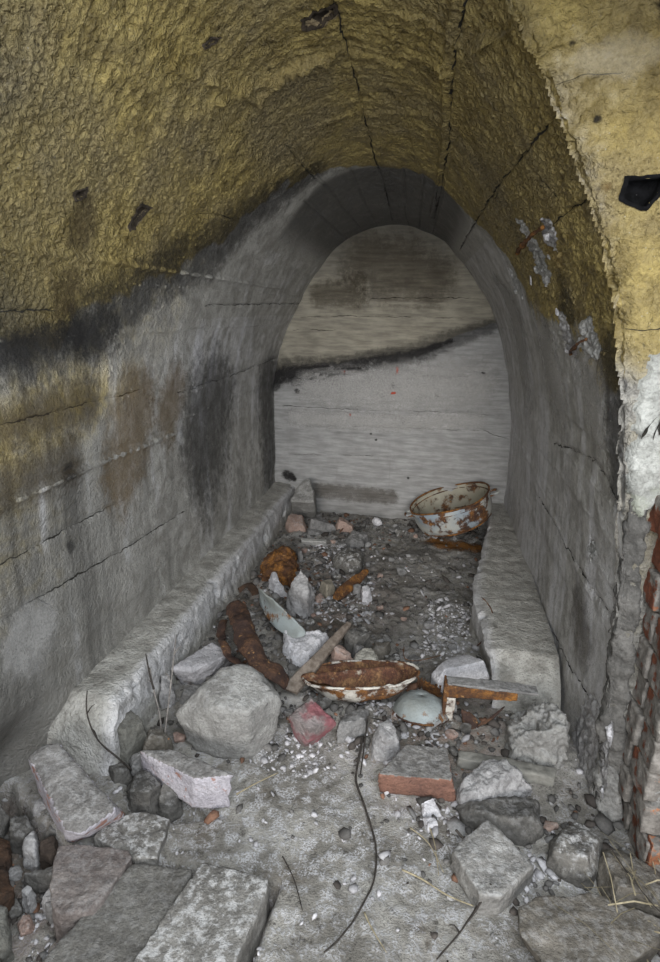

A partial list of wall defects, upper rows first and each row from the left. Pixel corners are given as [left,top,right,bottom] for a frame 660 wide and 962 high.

crack [333,0,393,219]
crack [434,0,468,222]
crack [559,72,654,84]
crack [460,115,556,249]
crack [539,180,587,223]
spalling [515,217,564,287]
damp [273,339,453,393]
spalling [555,308,603,362]
crack [1,389,139,425]
peeling [618,353,660,517]
crack [0,499,125,565]
crack [23,511,185,606]